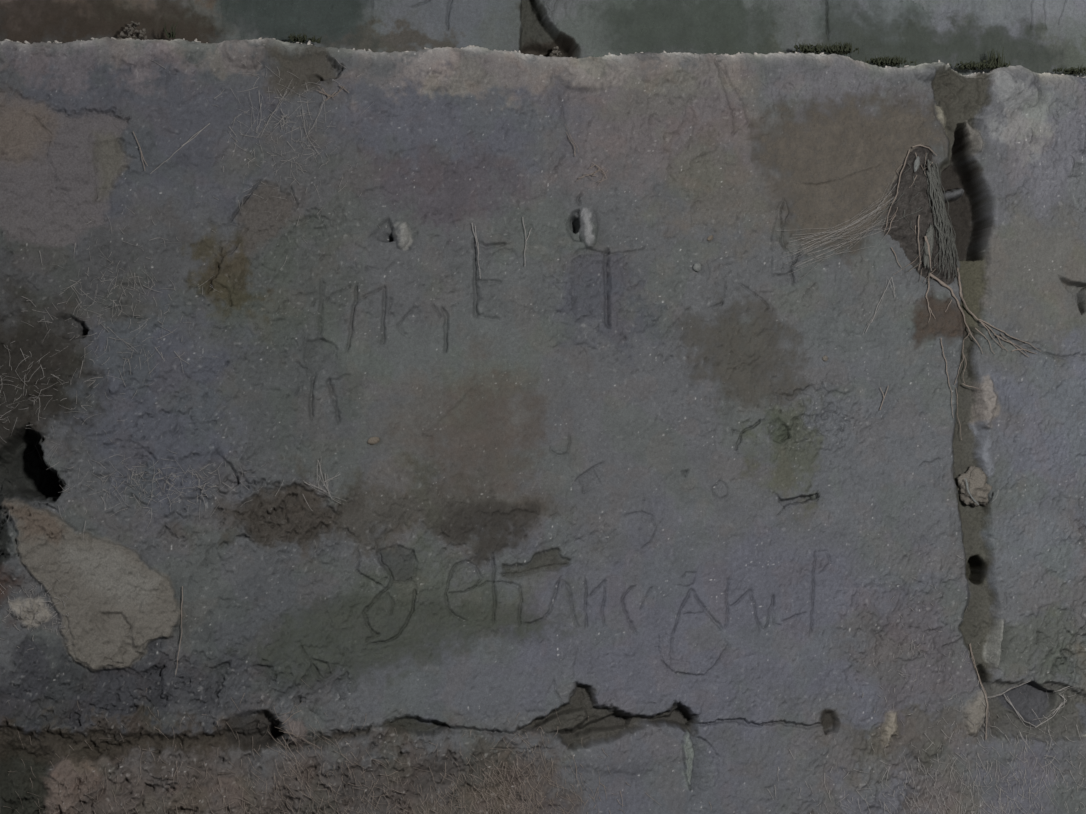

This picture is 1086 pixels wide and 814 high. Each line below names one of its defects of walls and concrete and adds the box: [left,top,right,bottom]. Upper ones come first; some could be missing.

flaking render [0,422,187,673]